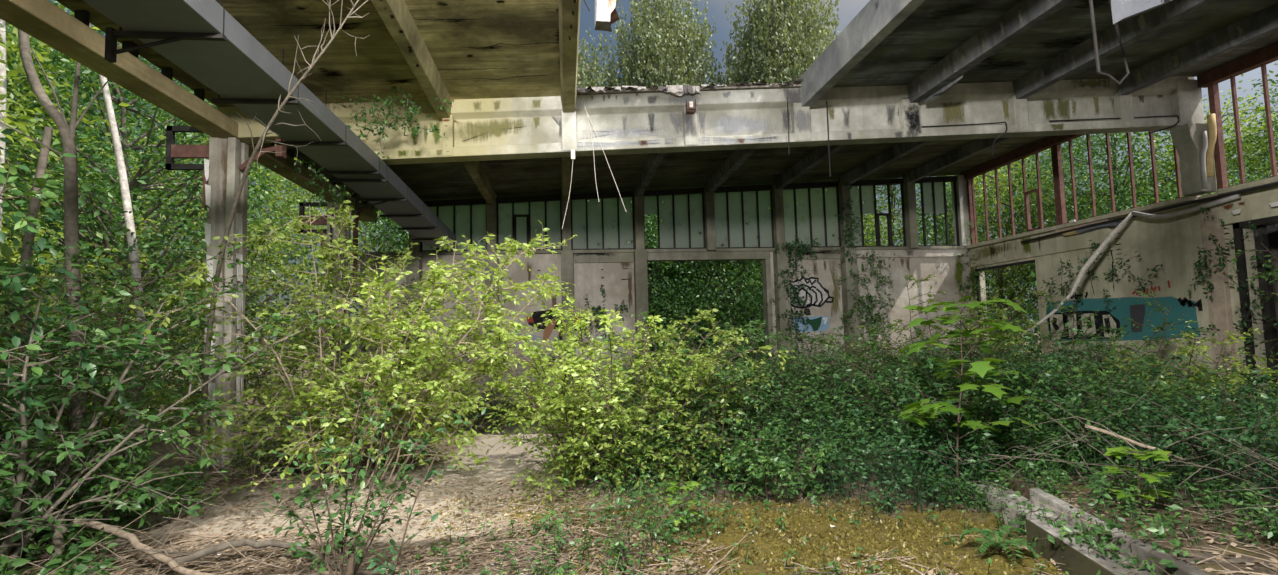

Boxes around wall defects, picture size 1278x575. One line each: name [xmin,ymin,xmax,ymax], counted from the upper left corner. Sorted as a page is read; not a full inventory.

damp [1075,0,1109,8]
damp [311,22,363,31]
damp [888,57,946,137]
damp [1044,98,1076,119]